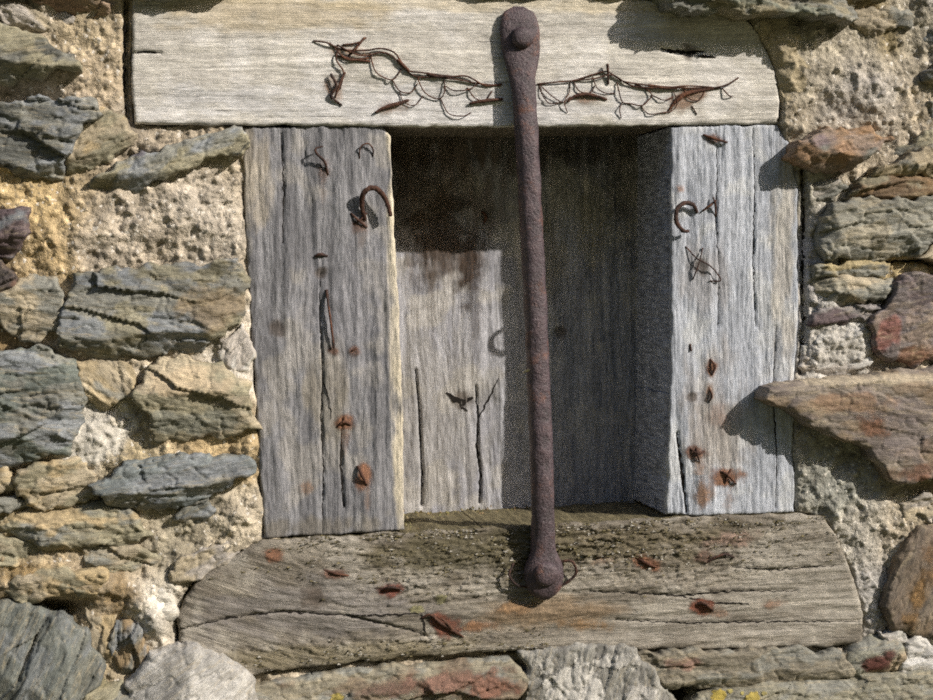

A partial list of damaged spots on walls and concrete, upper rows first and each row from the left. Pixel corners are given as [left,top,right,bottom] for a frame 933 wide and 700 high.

crack [123,3,160,113]
crack [662,48,716,58]
crack [319,275,345,532]
corrosion [357,463,372,489]
corrosion [686,446,746,505]
corrosion [634,555,660,571]
crack [179,610,428,637]
corrosion [380,584,403,597]
corrosion [431,601,600,638]
corrosion [690,599,726,616]
crack [590,564,859,624]